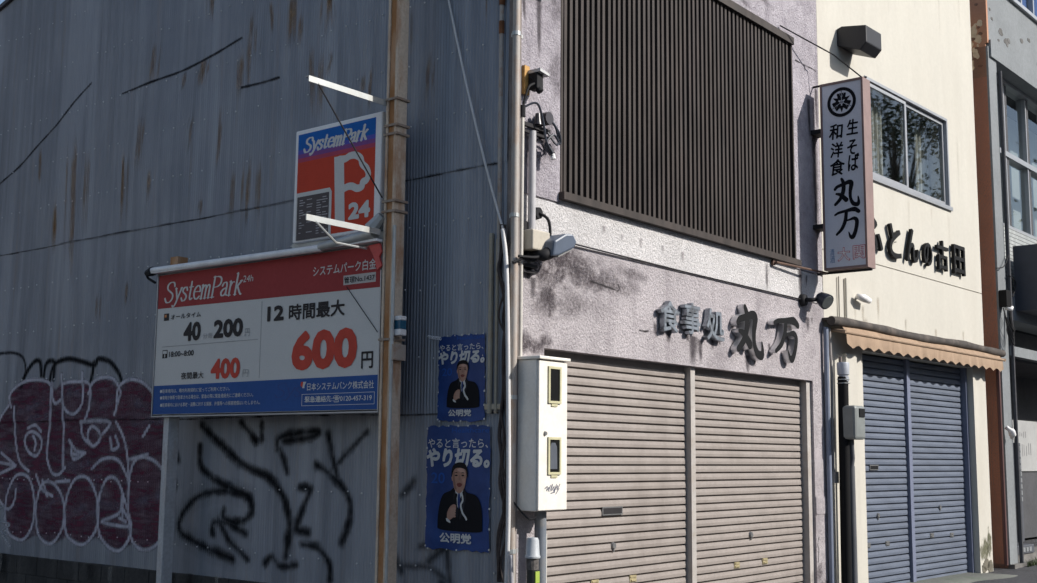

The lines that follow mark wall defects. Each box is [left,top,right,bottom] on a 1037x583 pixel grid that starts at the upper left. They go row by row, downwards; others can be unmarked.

water stain [527,251,623,313]
mould [522,334,550,353]
water stain [686,335,734,359]